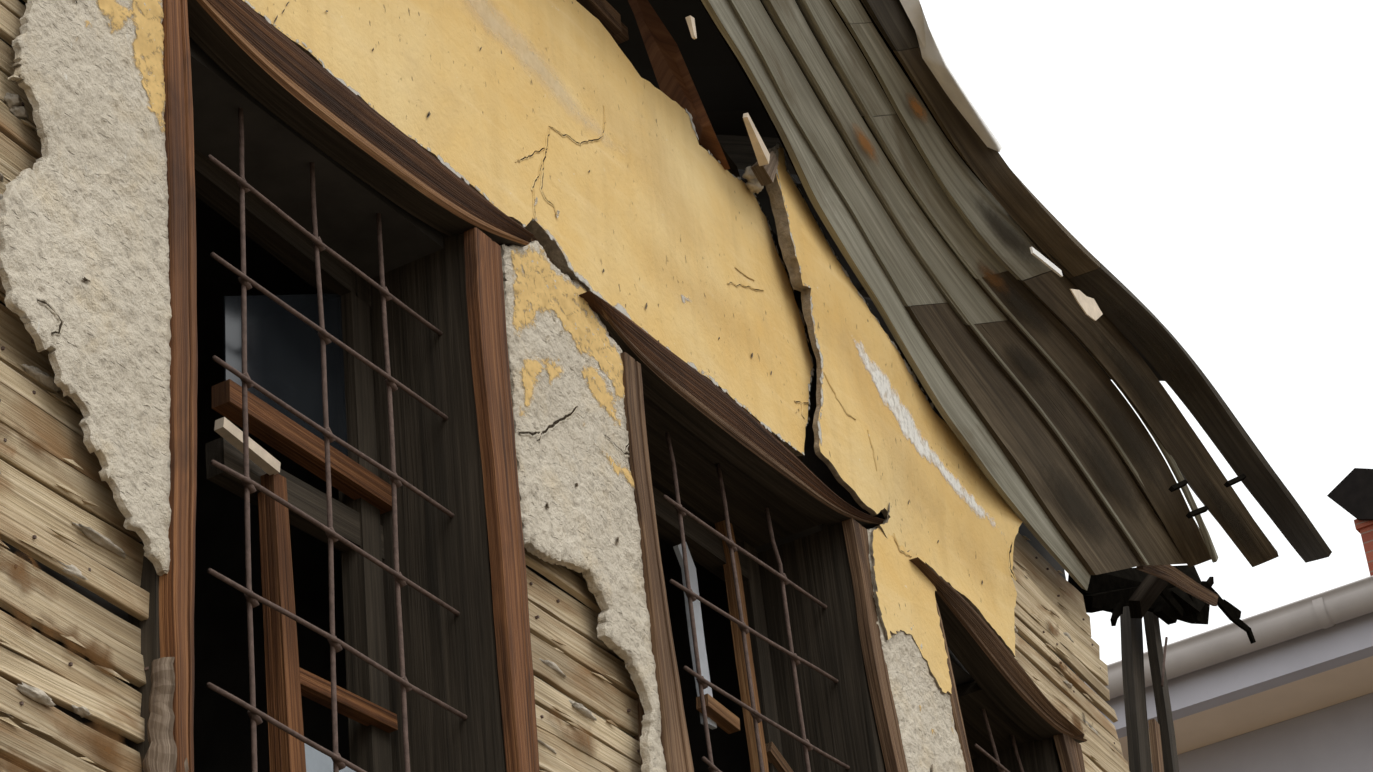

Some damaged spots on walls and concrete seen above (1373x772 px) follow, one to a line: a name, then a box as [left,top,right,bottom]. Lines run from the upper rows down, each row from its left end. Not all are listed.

spalling [244,0,393,124]
spalling [409,135,498,208]
crack [515,105,606,219]
crack [719,142,740,178]
flaking render [0,0,172,576]
crack [727,267,764,291]
crack [794,372,877,471]
flaking render [500,197,670,772]
flaking render [867,503,966,772]